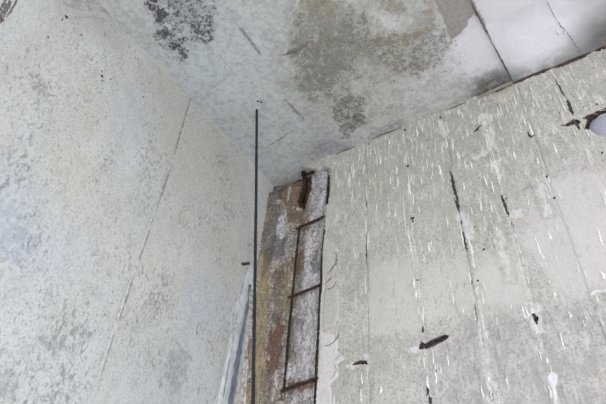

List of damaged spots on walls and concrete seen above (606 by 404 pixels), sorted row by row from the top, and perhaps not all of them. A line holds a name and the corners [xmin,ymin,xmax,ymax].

water stain [144,0,216,61]
crack [470,0,606,130]
water stain [306,0,581,192]
corrosion [276,176,312,233]
water stain [317,172,328,209]
crack [450,172,468,250]
crack [501,193,514,228]
spalling [238,168,368,404]
water stain [446,150,561,404]
water stain [341,348,374,403]
water stain [400,342,449,389]
spalling [419,335,449,350]